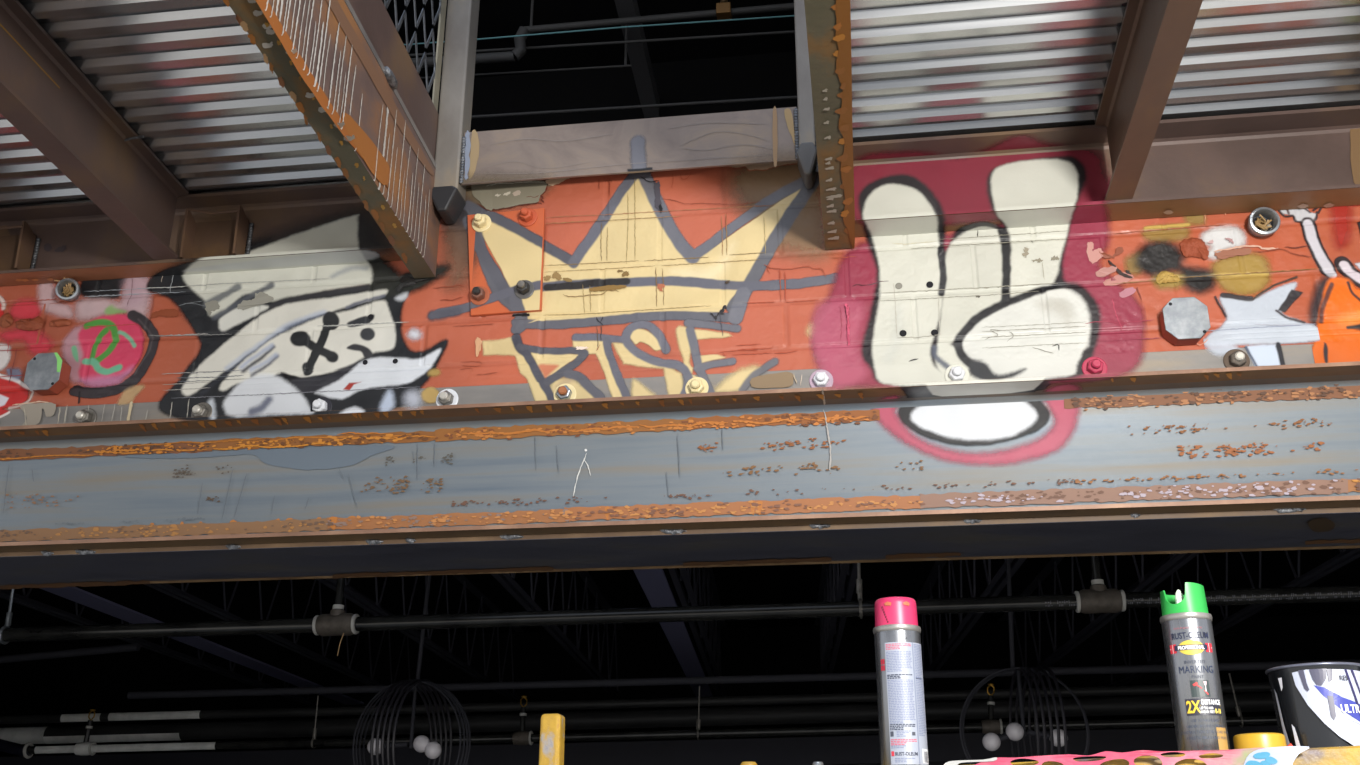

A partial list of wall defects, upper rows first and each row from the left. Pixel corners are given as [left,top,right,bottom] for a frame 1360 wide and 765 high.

corrosion [223,0,407,263]
corrosion [831,0,855,249]
corrosion [0,393,1360,542]
corrosion [1064,373,1360,410]